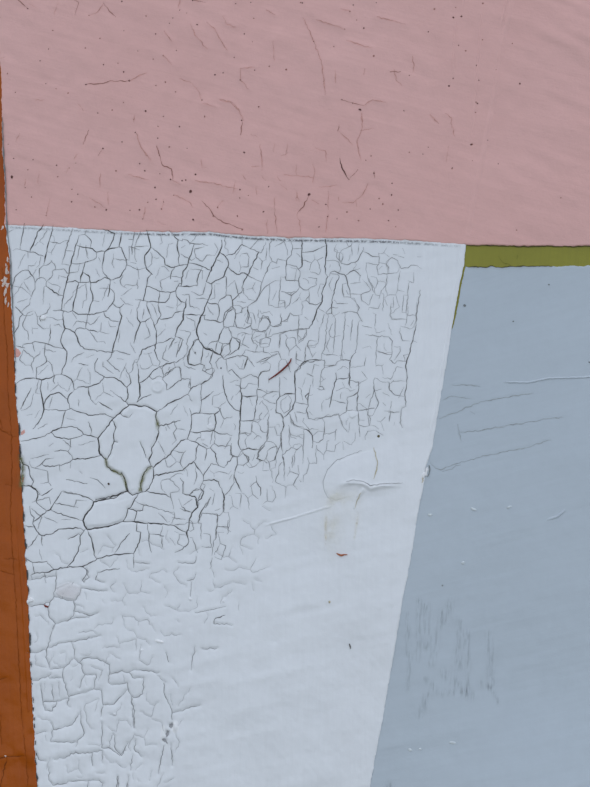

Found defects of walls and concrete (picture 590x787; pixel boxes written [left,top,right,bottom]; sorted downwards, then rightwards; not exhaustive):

crack [303,9,371,93]
crack [0,78,422,787]